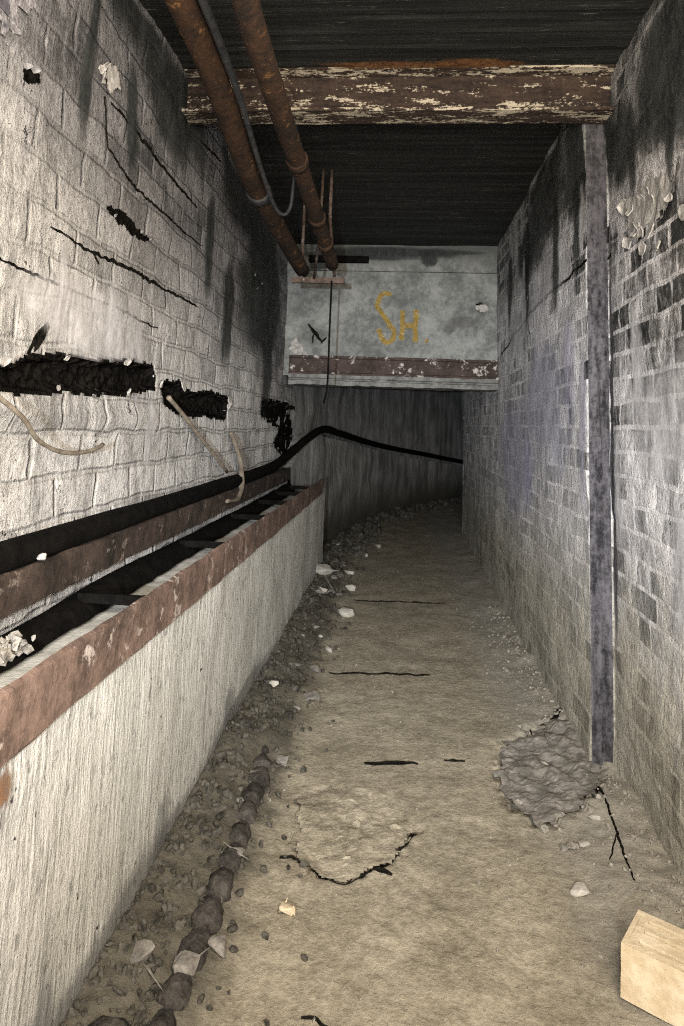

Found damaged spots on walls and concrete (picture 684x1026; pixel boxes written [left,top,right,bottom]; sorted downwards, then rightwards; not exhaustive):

water stain [663,80,684,197]
spalling [0,351,233,421]
crack [527,707,562,737]
corrosion [0,767,11,806]
crack [279,833,416,886]
crack [595,784,636,881]